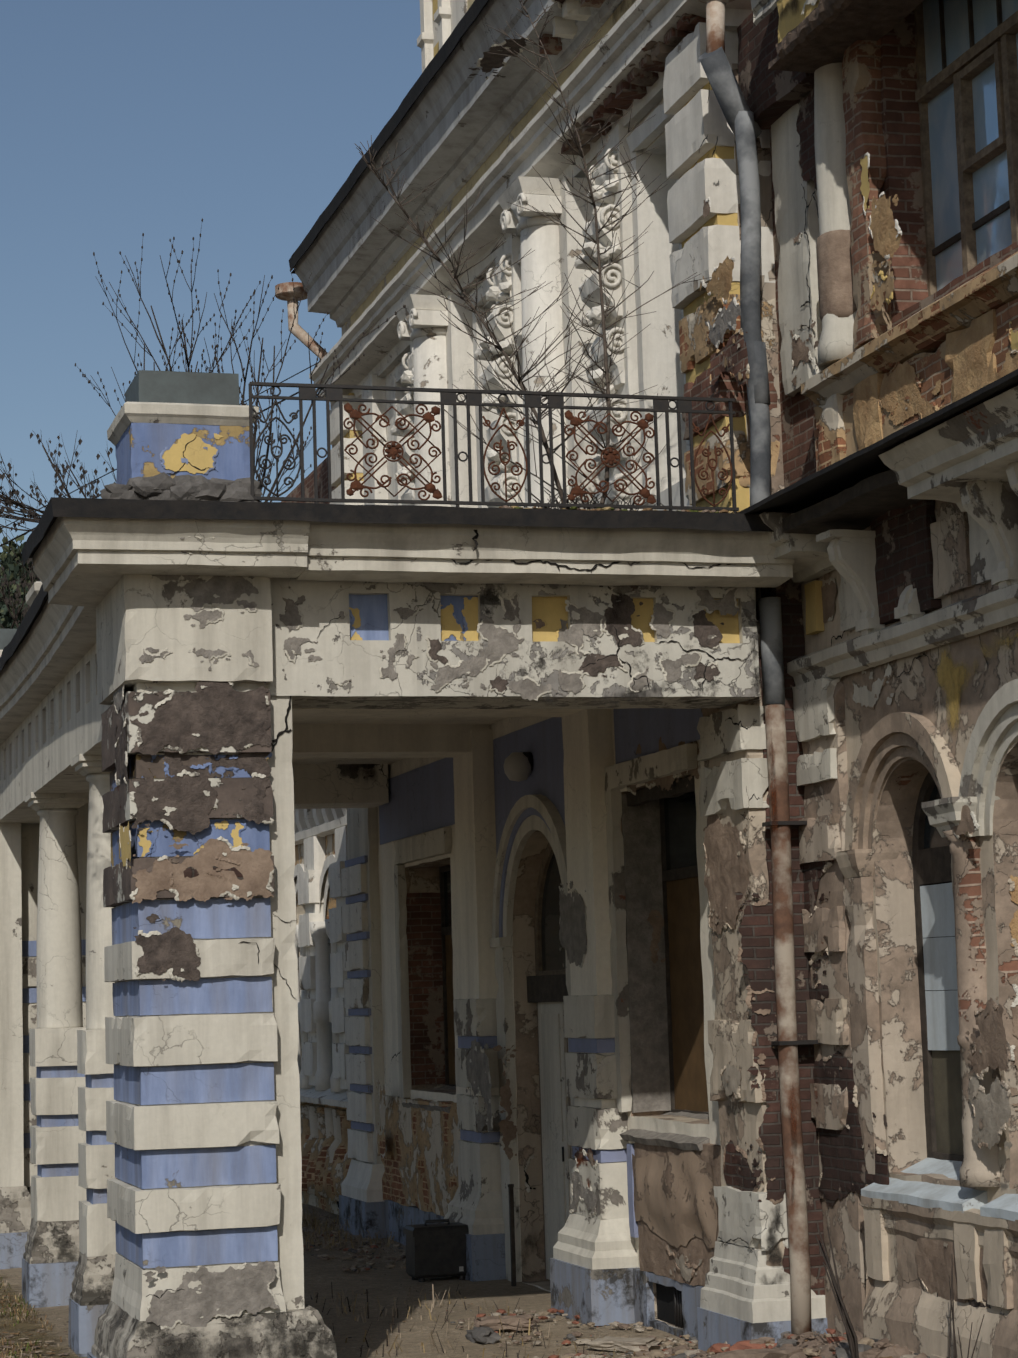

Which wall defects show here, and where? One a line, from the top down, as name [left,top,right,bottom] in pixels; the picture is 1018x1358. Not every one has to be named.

spalling [860,152,902,312]
flaking render [700,256,750,405]
peeling [160,433,223,475]
peeling [150,575,259,628]
crack [451,530,640,572]
peeling [379,583,740,701]
crack [271,696,292,751]
spalling [110,647,274,982]
spalling [703,812,786,1205]
flaking render [813,1051,889,1206]
spalling [965,974,1018,1151]
leakage [156,1331,305,1358]